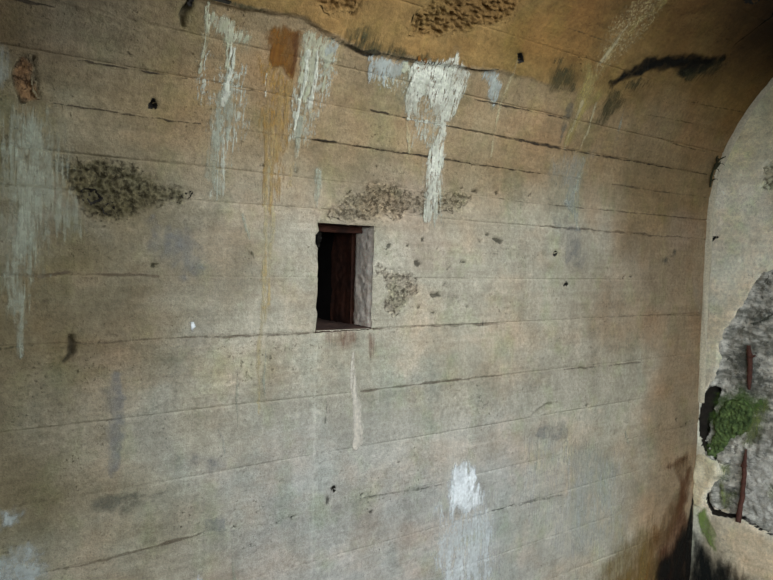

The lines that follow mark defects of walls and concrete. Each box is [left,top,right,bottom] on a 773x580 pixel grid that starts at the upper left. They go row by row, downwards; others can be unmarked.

damp [197,0,250,201]
rust [258,26,301,214]
damp [288,32,339,152]
damp [350,26,470,223]
spalling [407,0,519,42]
damp [483,71,508,126]
damp [553,0,726,143]
spalling [705,270,773,533]
damp [436,462,492,580]
damp [605,498,738,580]